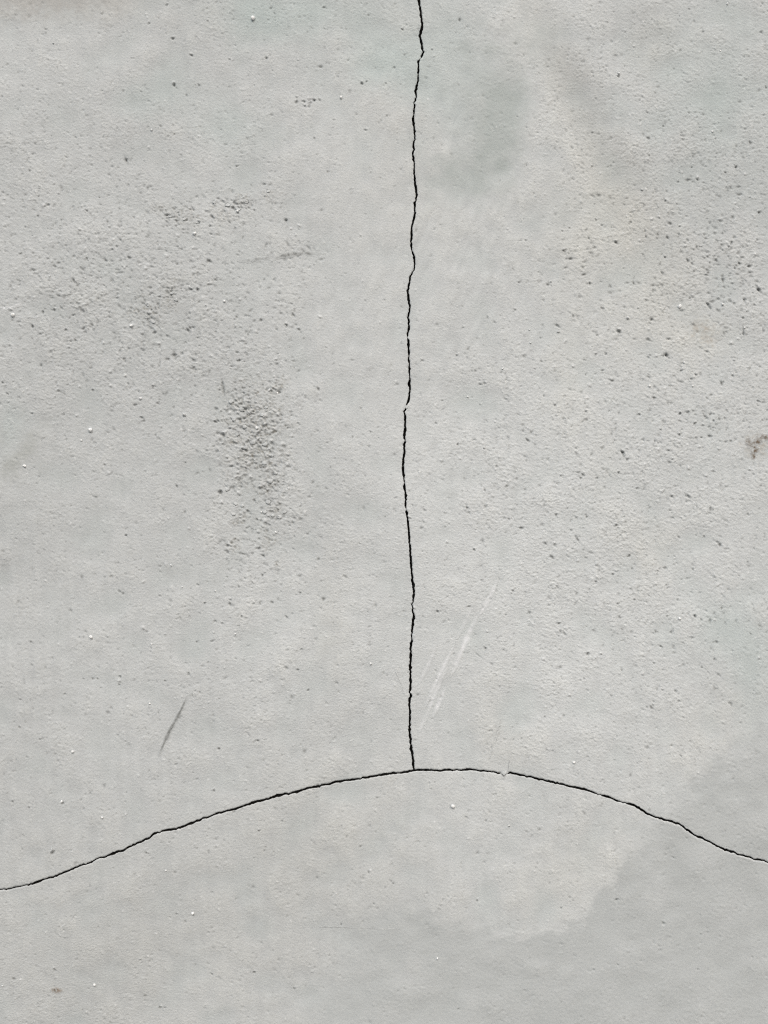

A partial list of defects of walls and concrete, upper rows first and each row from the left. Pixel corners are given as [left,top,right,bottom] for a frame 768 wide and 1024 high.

crack [402,0,424,768]
crack [0,760,768,890]